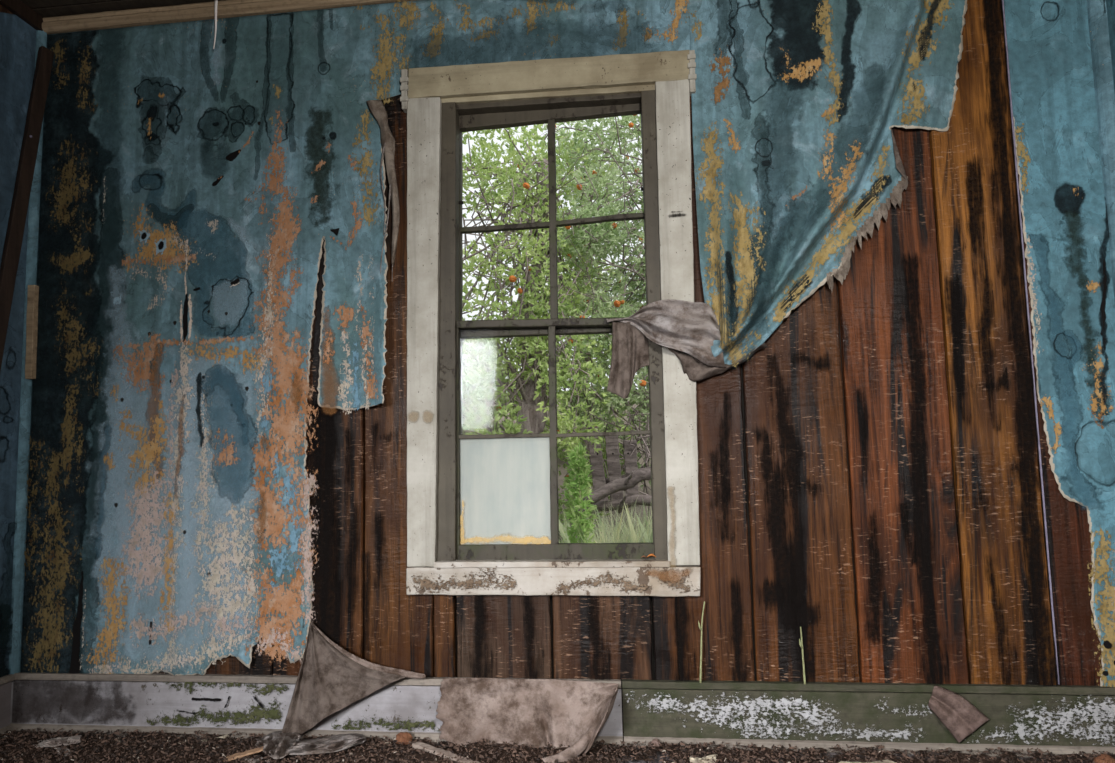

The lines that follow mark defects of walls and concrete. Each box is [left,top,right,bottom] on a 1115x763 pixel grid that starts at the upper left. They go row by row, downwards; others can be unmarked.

damp [197,13,336,226]
peeling [345,109,382,250]
damp [715,0,825,112]
peeling [695,0,892,369]
damp [837,0,861,122]
peeling [897,0,955,127]
peeling [338,254,375,414]
damp [945,275,971,423]
peeling [408,568,521,593]
peeling [556,570,700,593]
damp [759,354,824,683]
damp [898,253,949,685]